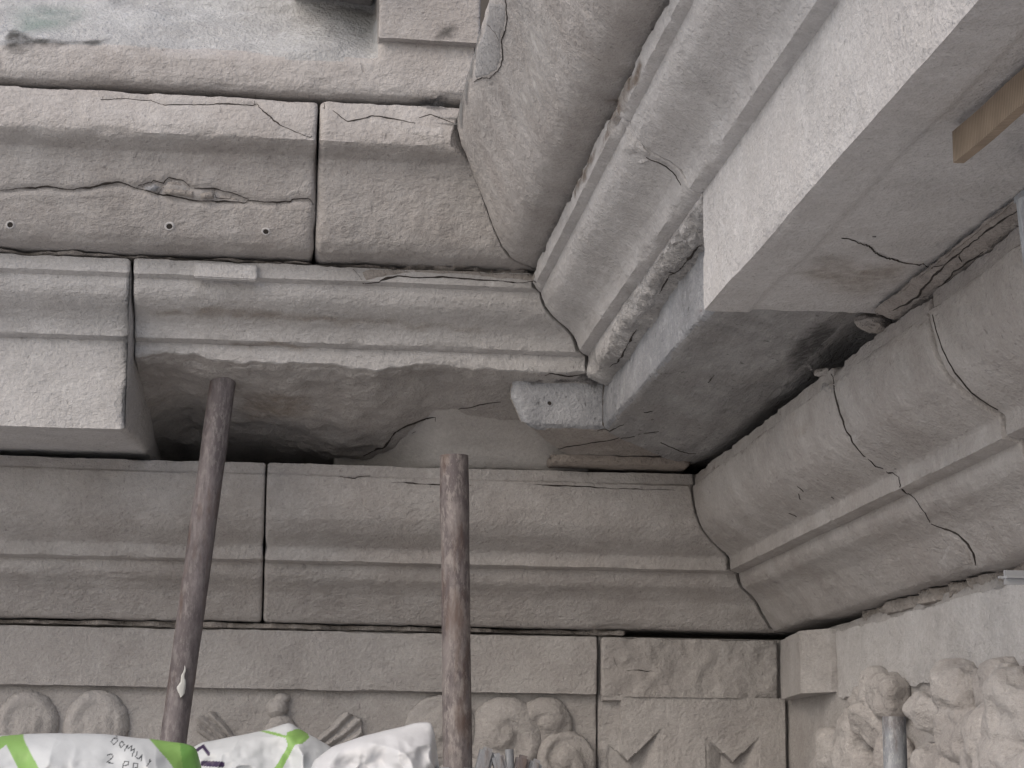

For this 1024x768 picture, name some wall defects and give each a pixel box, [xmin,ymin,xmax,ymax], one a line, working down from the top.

crack [474,0,508,82]
crack [100,95,453,138]
crack [9,177,313,203]
crack [646,157,681,185]
crack [842,211,1017,410]
crack [340,402,498,479]
crack [538,483,666,491]
crack [831,374,976,565]